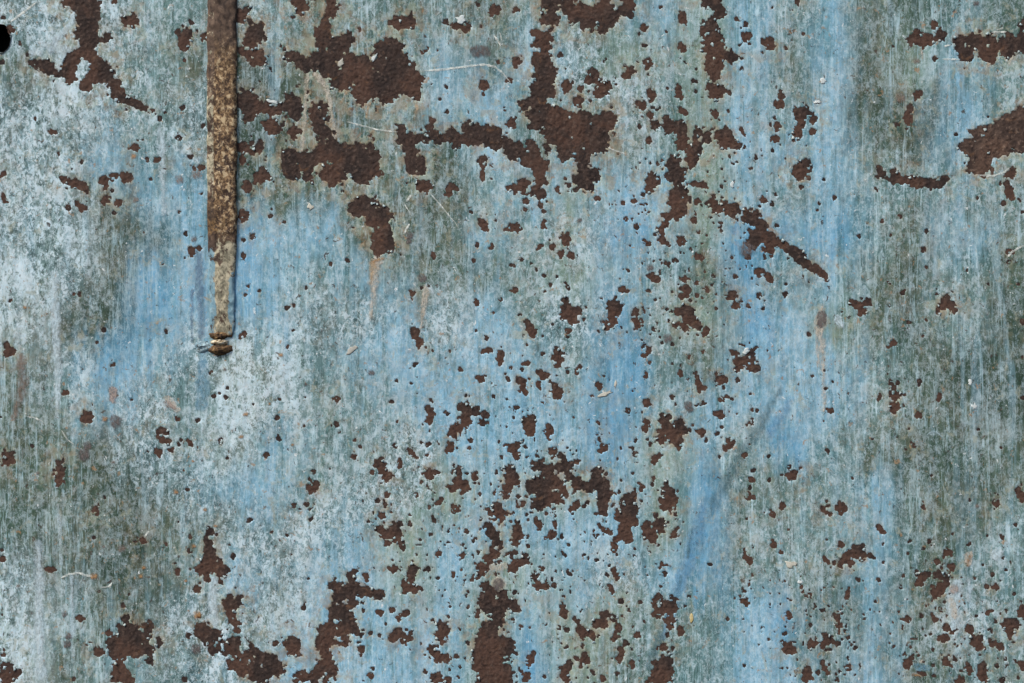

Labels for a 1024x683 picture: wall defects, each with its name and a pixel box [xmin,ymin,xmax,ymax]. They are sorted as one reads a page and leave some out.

rust [174,0,829,683]